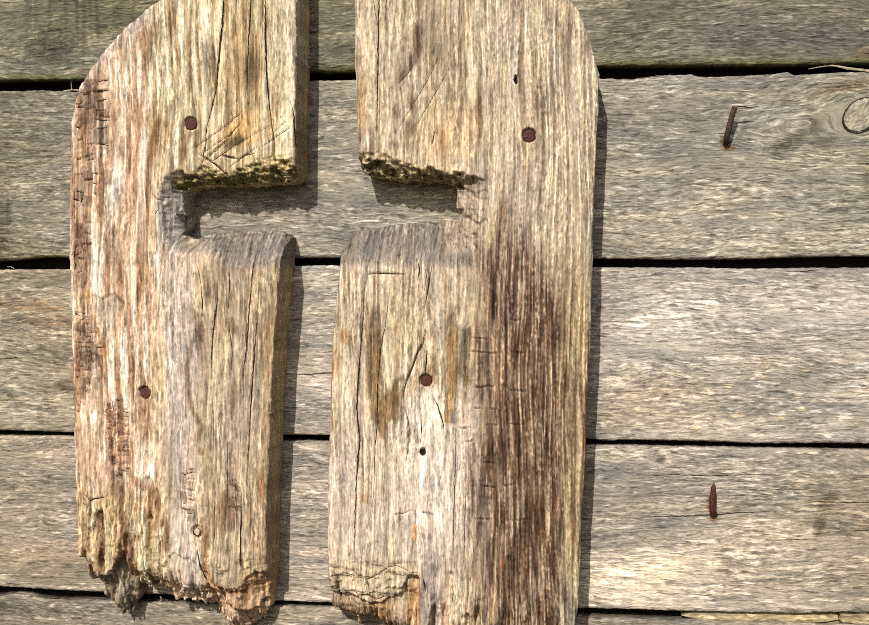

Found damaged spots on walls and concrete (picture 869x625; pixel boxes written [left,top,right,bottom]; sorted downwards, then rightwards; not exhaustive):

crack [202,0,296,177]
crack [180,251,259,568]
crack [341,258,432,605]
damp [471,246,566,625]